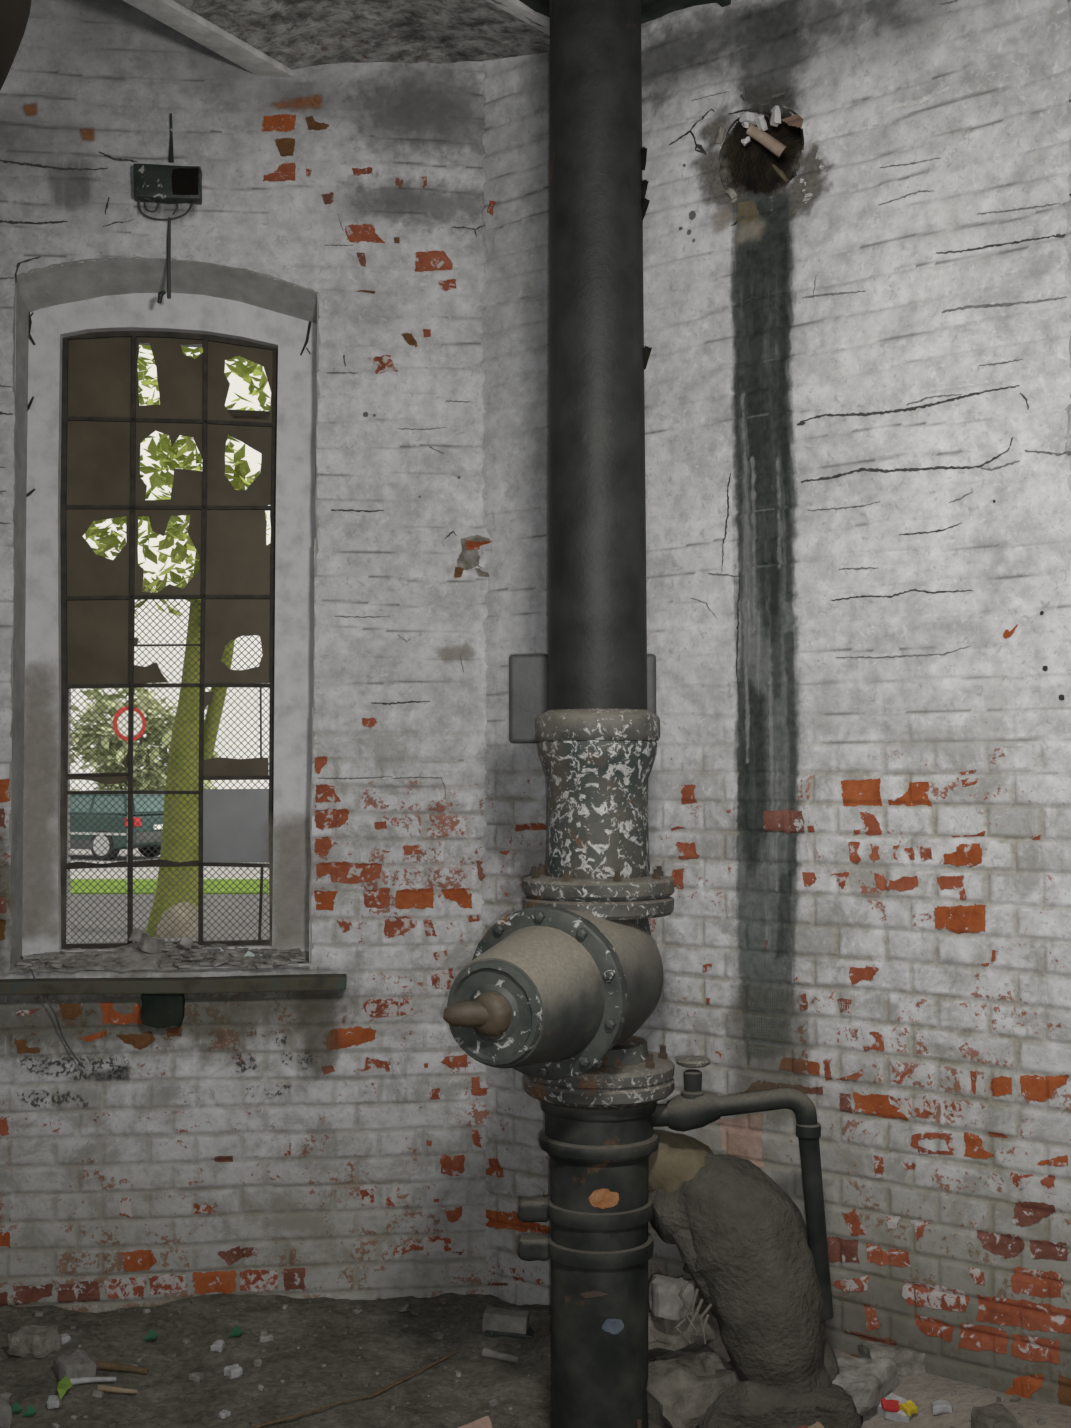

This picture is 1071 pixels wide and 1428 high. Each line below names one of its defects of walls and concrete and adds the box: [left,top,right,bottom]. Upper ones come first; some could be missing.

spalling [679,90,830,242]
crack [803,278,866,298]
crack [879,158,940,205]
crack [936,193,1071,254]
crack [941,296,1067,313]
crack [797,359,1071,535]
damp [741,393,756,763]
damp [768,650,780,811]
peeling [314,756,486,989]
peeling [802,778,986,934]
peeling [736,1057,1069,1170]
peeling [827,1155,1071,1406]